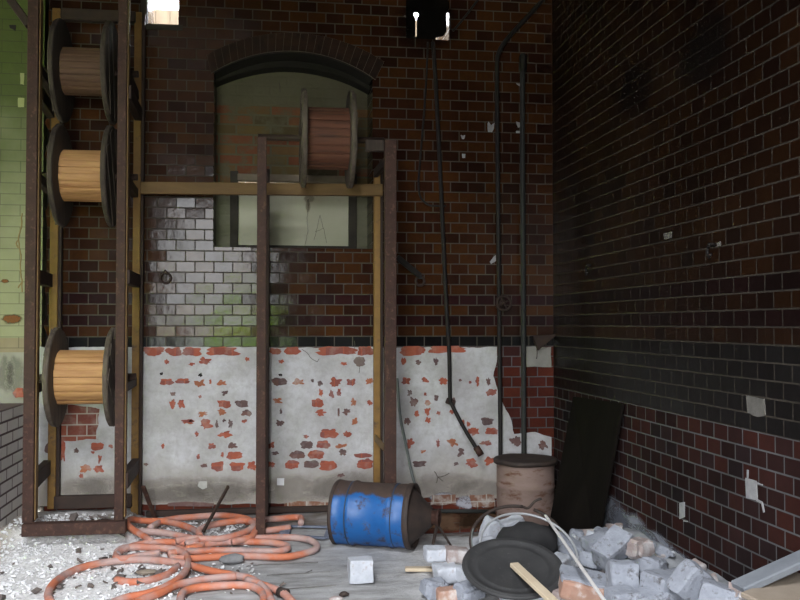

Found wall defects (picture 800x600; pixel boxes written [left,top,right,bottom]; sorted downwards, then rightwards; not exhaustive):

flaking render [315,346,373,367]
flaking render [400,346,466,365]
flaking render [143,347,256,472]
flaking render [269,374,355,416]
flaking render [401,377,456,425]
flaking render [459,376,497,396]
peeling [746,396,766,417]
flaking render [61,405,113,478]
flaking render [285,398,373,477]
flaking render [436,439,494,468]
flaking render [462,417,498,446]
peeling [745,470,765,513]